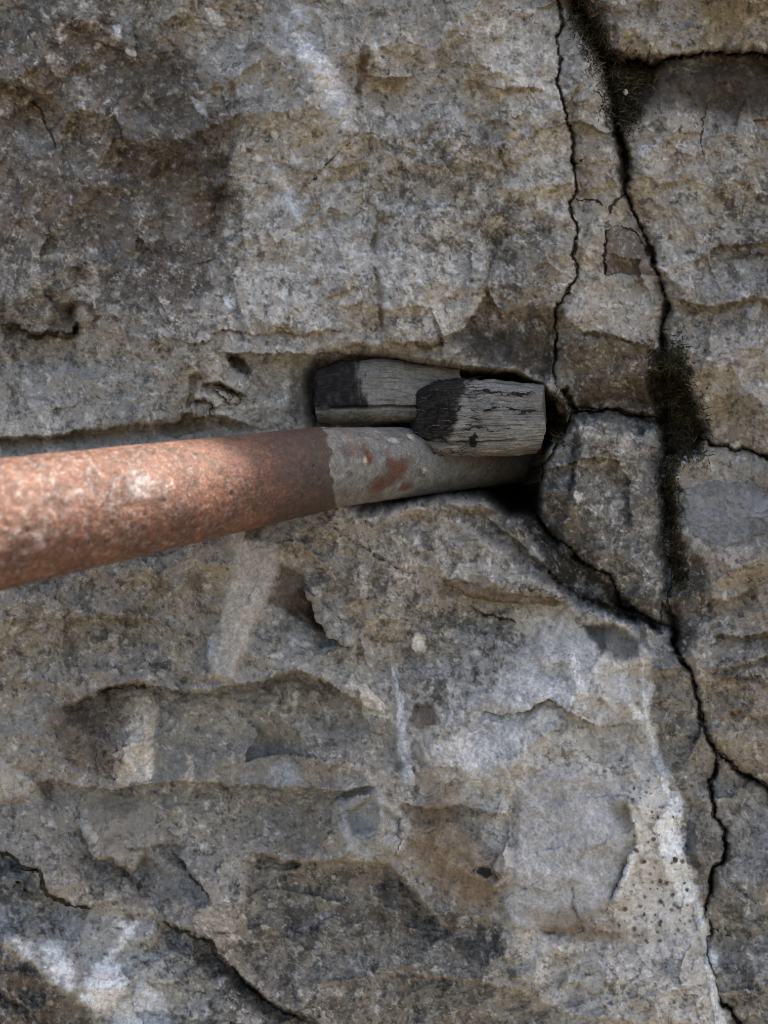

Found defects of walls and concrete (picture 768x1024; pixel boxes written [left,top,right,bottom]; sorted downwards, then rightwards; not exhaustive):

leakage [629,63,768,112]
crack [534,0,768,958]
crack [0,851,92,910]
crack [172,850,208,898]
crack [162,921,307,1022]
crack [719,995,742,1024]